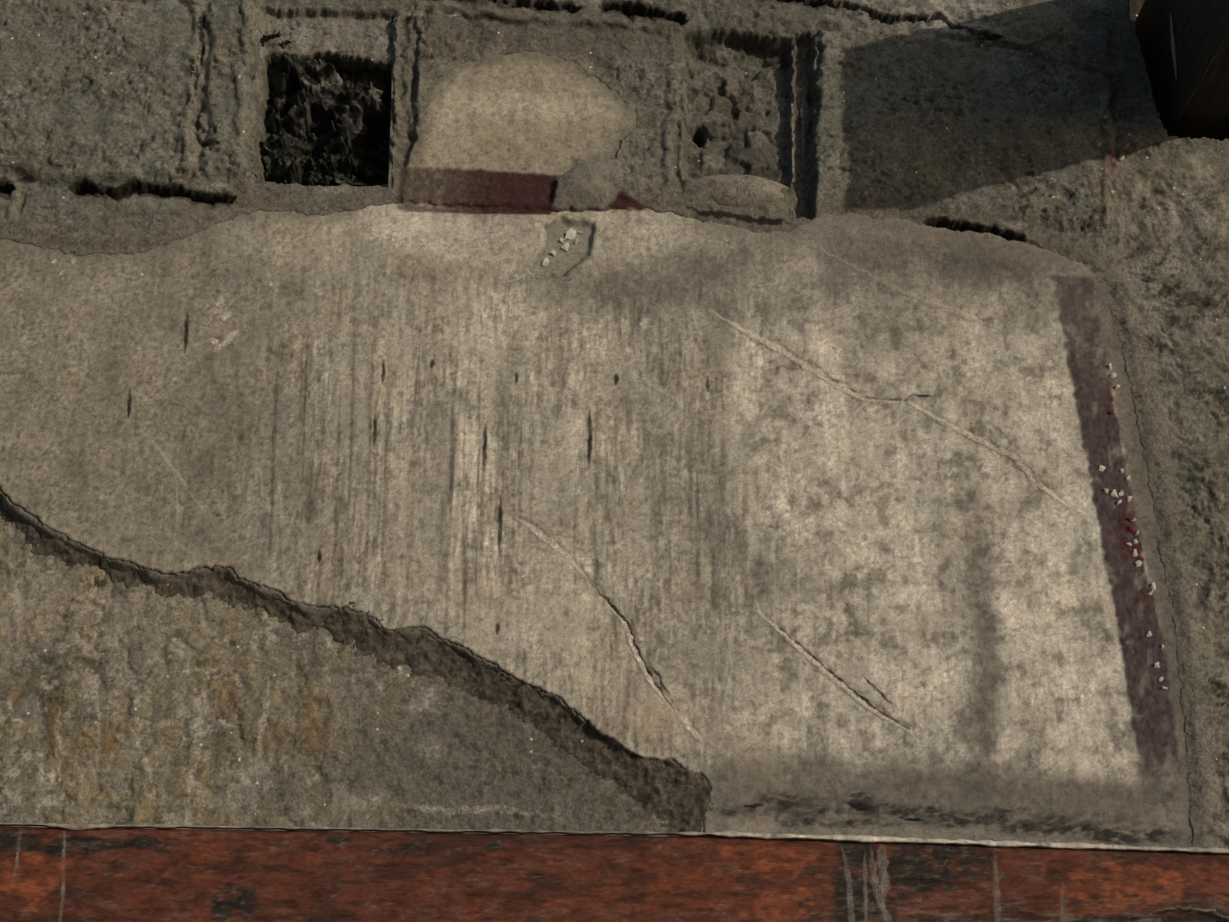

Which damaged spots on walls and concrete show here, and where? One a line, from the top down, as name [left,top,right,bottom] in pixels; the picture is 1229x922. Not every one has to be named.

spalling [528,220,594,276]
crack [730,323,885,402]
crack [914,394,1062,502]
spalling [0,486,714,837]
crack [517,519,699,739]
crack [772,624,903,726]